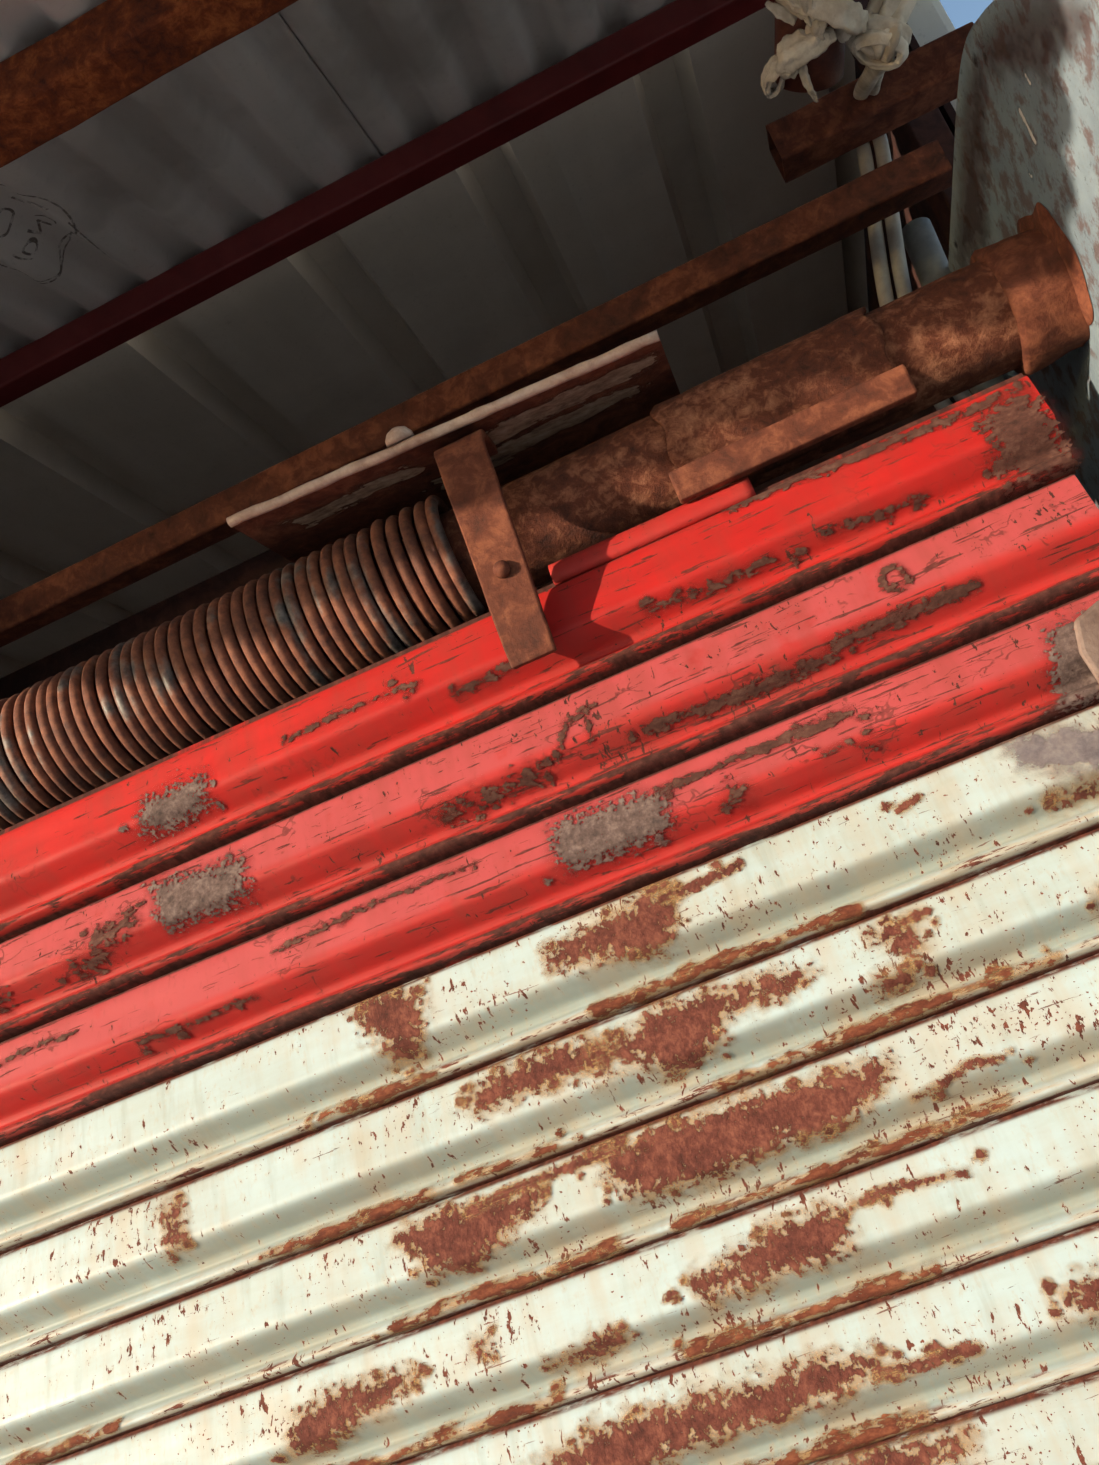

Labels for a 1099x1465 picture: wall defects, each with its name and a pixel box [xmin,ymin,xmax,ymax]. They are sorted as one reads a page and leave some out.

peeling [118,766,226,850]
peeling [542,710,870,886]
peeling [55,850,268,984]
peeling [0,985,15,1014]
rust [258,856,1061,1340]
rust [673,1264,943,1361]
rust [271,1311,640,1465]
rust [542,1339,983,1465]